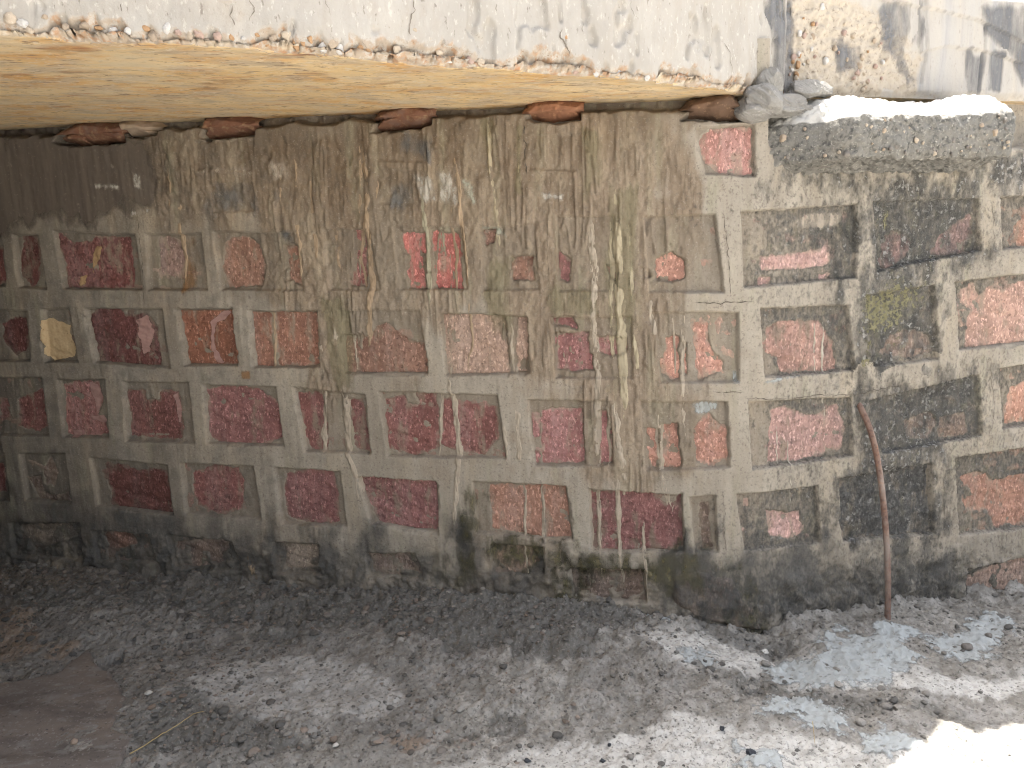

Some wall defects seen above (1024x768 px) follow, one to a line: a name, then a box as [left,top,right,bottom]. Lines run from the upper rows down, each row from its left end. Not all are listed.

leakage [0,127,182,237]
leakage [352,146,379,369]
leakage [418,158,475,304]
leakage [485,123,501,246]
spalling [136,315,155,354]
spalling [210,310,231,364]
leakage [510,316,519,372]
leakage [588,189,639,582]
leakage [642,153,1024,624]
leakage [490,483,546,595]